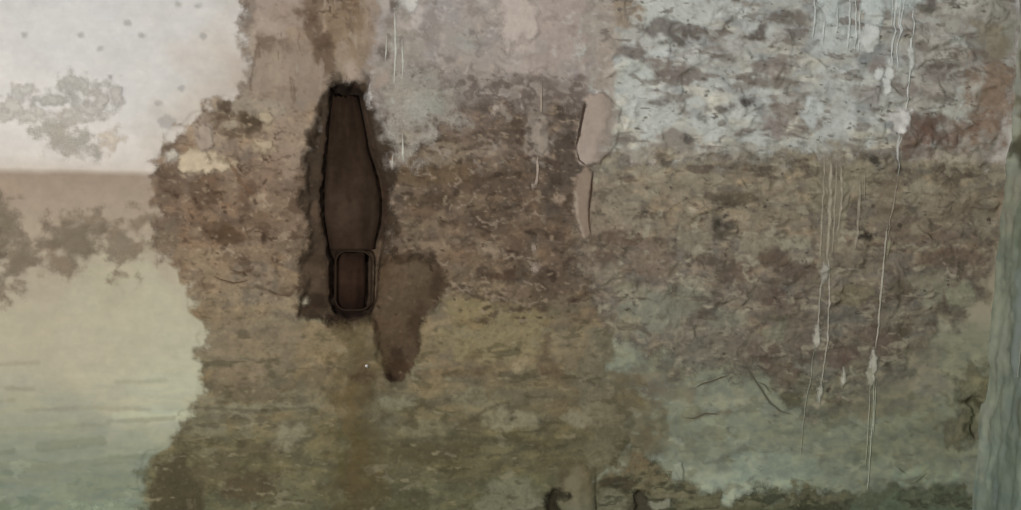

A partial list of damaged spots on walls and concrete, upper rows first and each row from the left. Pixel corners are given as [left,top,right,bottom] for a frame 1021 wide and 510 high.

peeling [0,66,127,168]
damp [0,188,164,311]
damp [294,7,475,383]
peeling [359,0,602,135]
peeling [577,91,623,172]
efflorescence [801,152,866,451]
damp [864,134,902,486]
spalling [933,358,990,455]